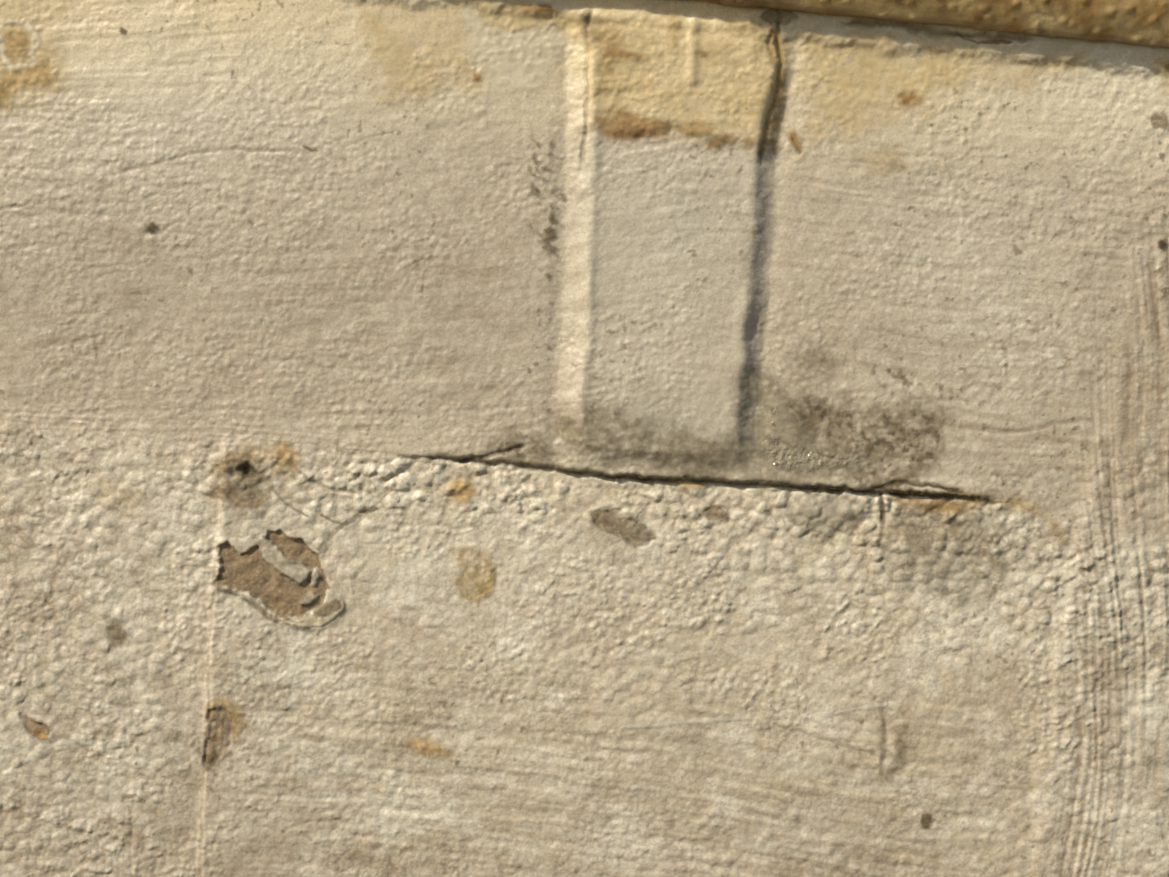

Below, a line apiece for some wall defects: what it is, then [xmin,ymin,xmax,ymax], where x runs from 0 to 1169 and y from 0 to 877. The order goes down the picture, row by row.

damp [467,0,576,82]
damp [538,199,565,255]
damp [506,435,552,460]
damp [557,375,944,494]
crack [556,468,995,523]
spalling [213,530,343,631]